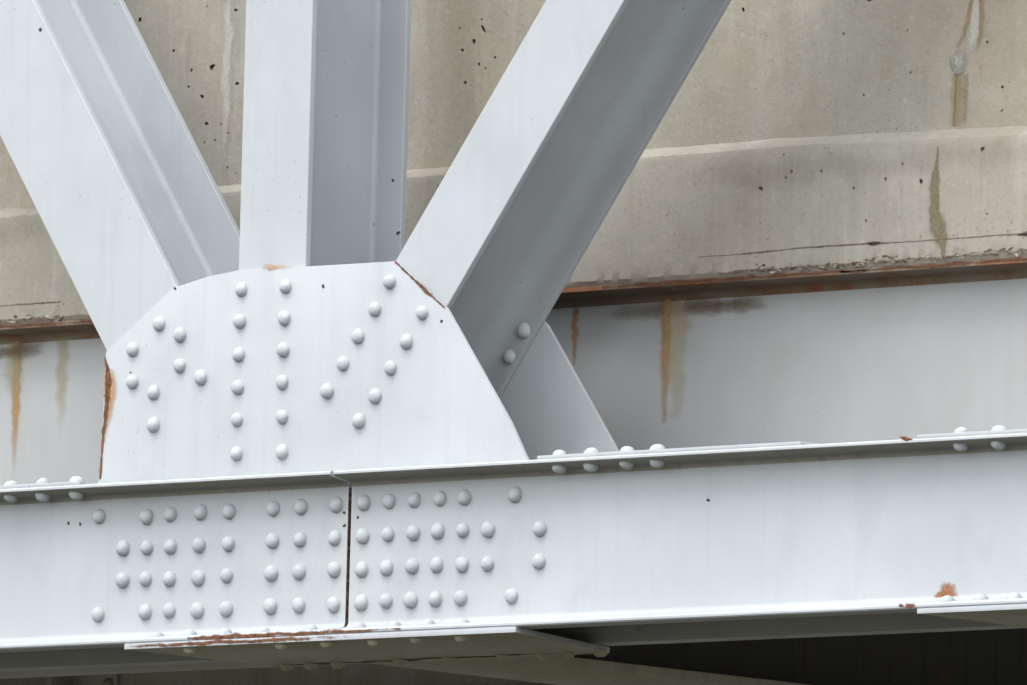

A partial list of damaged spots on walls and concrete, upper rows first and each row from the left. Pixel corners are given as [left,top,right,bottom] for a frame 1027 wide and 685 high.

leakage [930,146,946,260]
corrosion [602,257,1027,288]
corrosion [11,341,29,437]
corrosion [99,356,114,479]
corrosion [137,488,377,647]
corrosion [935,584,955,598]